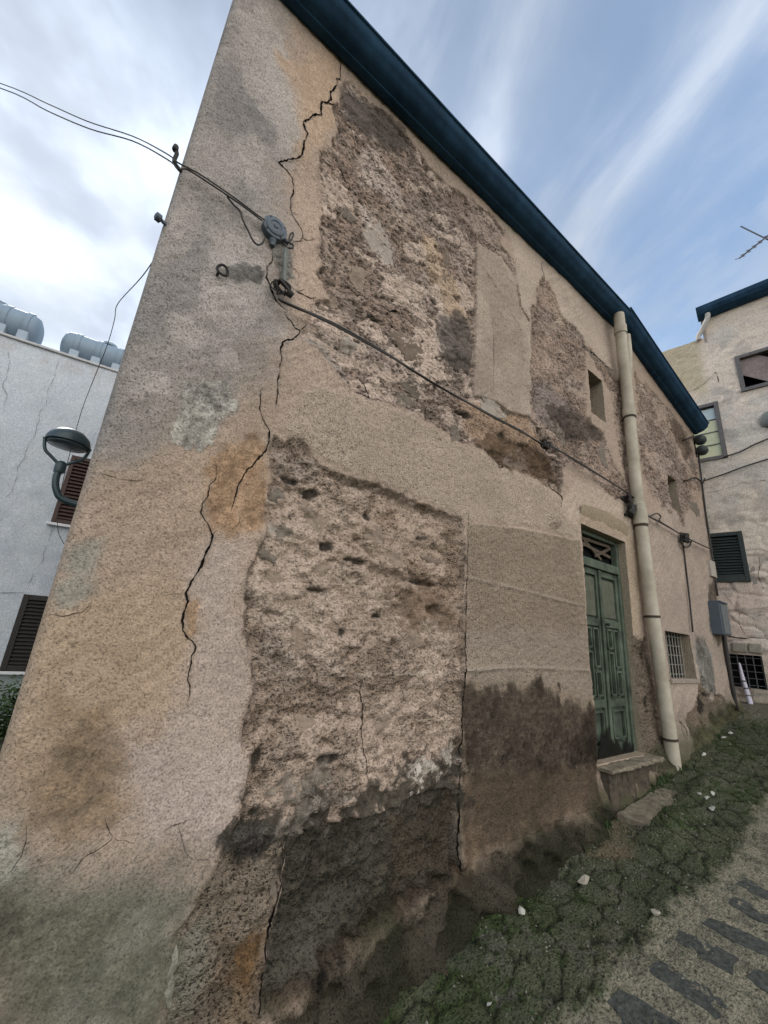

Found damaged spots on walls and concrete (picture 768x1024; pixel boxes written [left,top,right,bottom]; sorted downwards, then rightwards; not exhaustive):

crack [180,57,342,704]
peeling [300,81,702,527]
crack [258,839,285,1018]
spalling [164,434,467,1024]
water stain [215,677,598,1019]
crack [456,514,469,873]